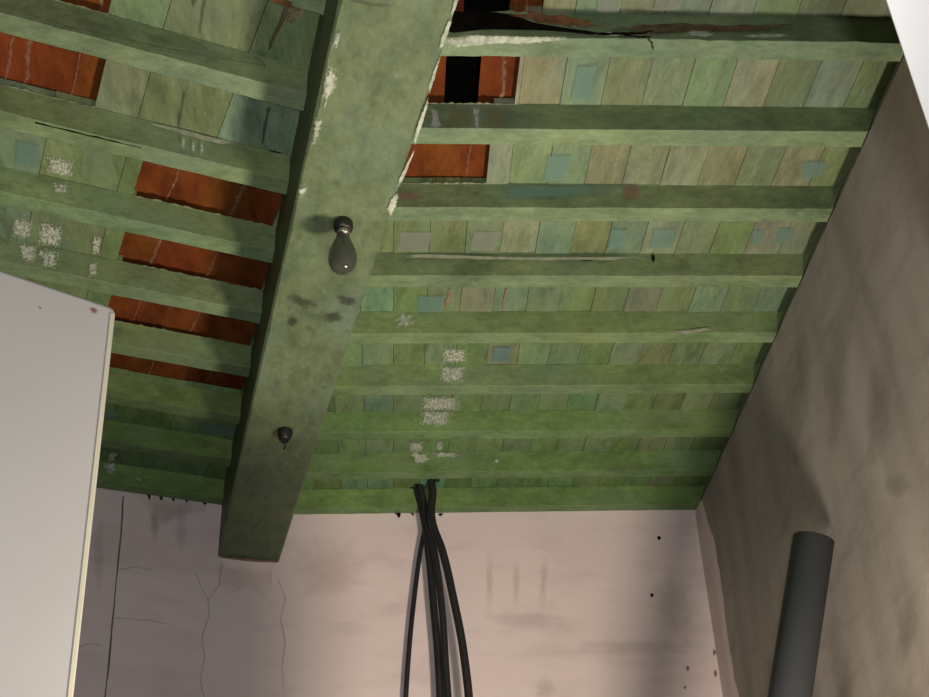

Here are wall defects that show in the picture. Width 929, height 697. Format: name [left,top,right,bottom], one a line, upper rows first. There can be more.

peeling [56,0,115,16]
crack [590,23,793,50]
peeling [0,32,106,108]
peeling [388,0,789,215]
peeling [133,161,283,227]
peeling [116,232,269,290]
peeling [108,295,257,346]
peeling [109,353,246,396]